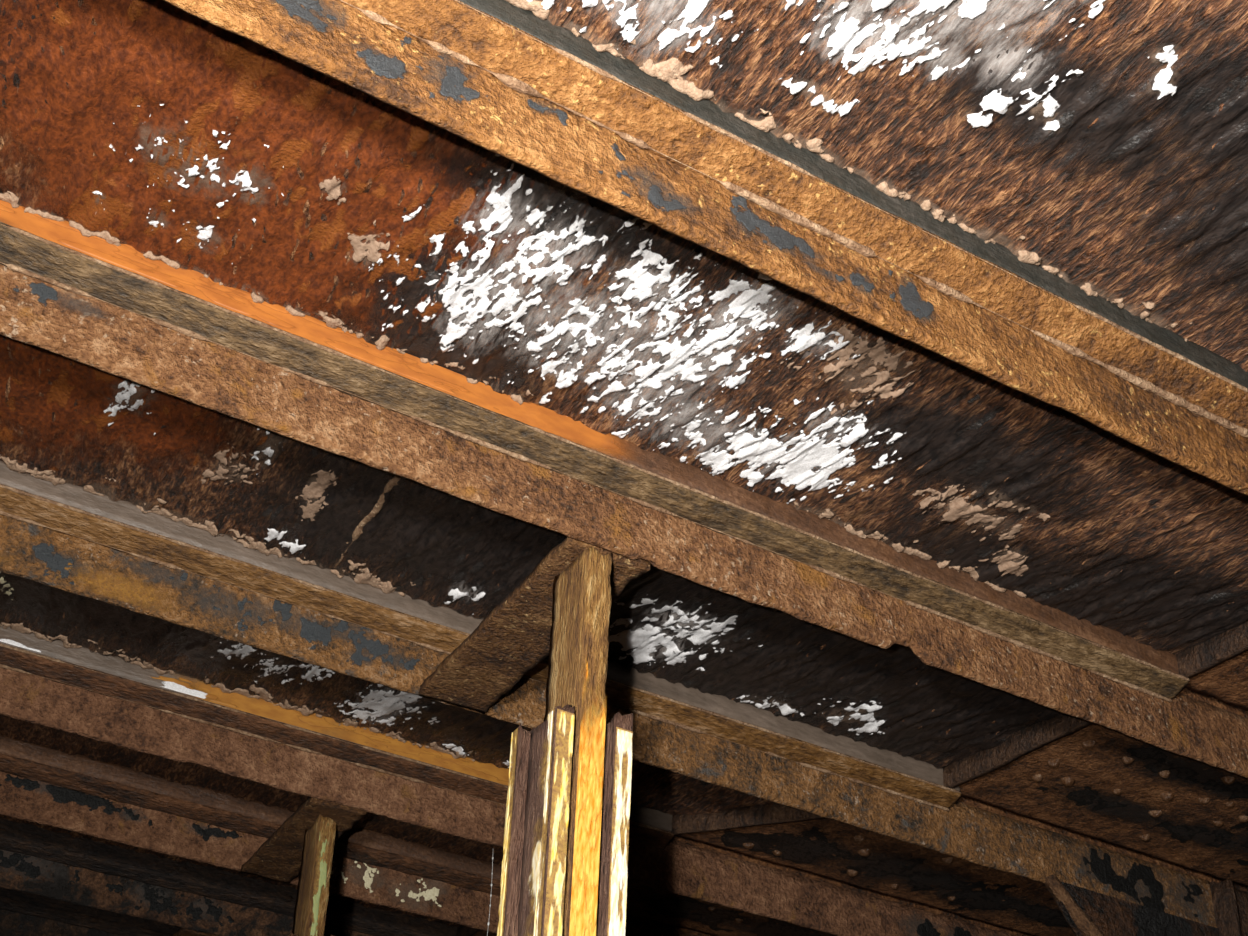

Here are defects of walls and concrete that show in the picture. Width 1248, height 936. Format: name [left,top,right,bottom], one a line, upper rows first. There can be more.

corrosion [0,0,621,465]
water stain [368,244,549,399]
water stain [448,156,679,267]
water stain [931,18,1248,307]
water stain [261,447,567,619]
water stain [818,324,1248,652]
water stain [0,572,532,766]
water stain [608,564,1061,768]
peeling [497,728,518,936]
peeling [528,709,575,936]